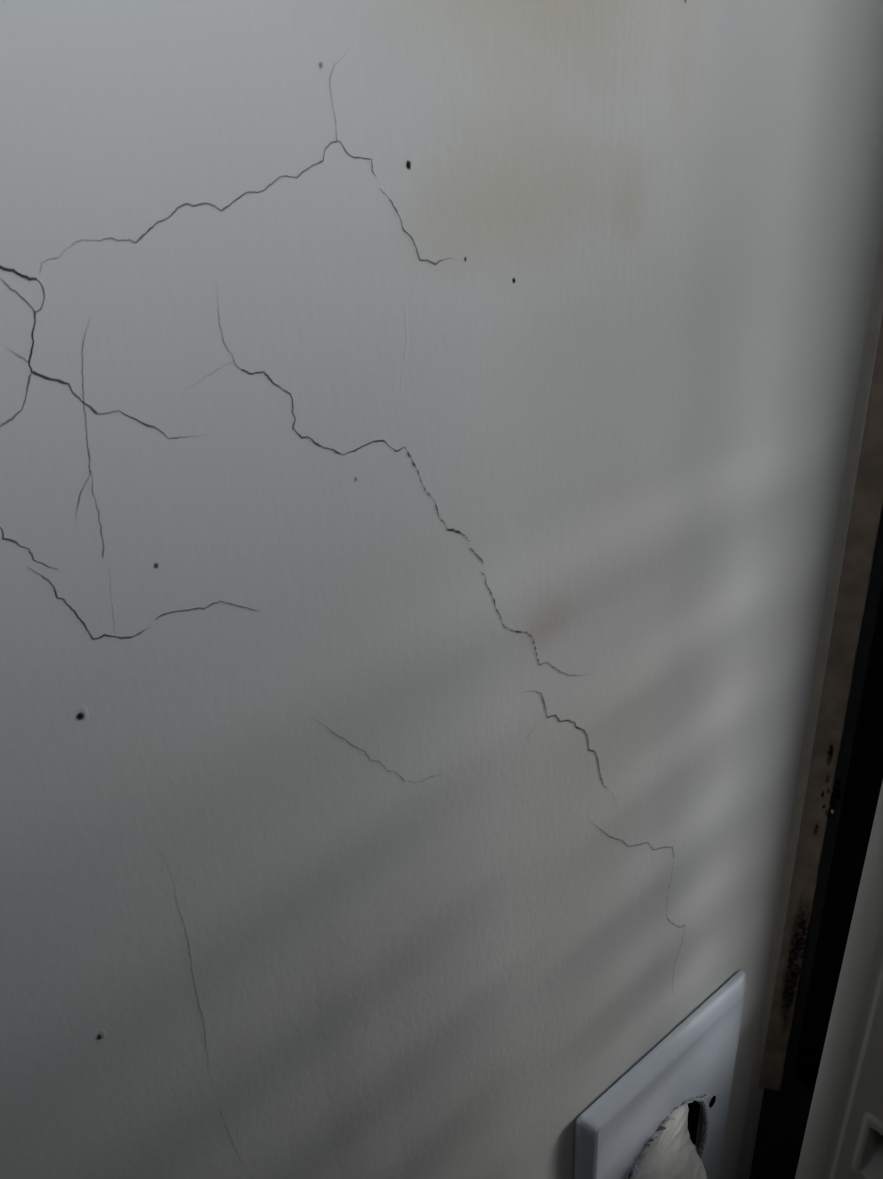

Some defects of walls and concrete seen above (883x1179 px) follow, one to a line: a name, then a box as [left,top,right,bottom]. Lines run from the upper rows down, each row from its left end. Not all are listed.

crack [129,141,374,243]
crack [388,197,442,265]
crack [0,266,169,439]
crack [241,368,559,671]
crack [0,527,246,640]
crack [541,694,603,783]